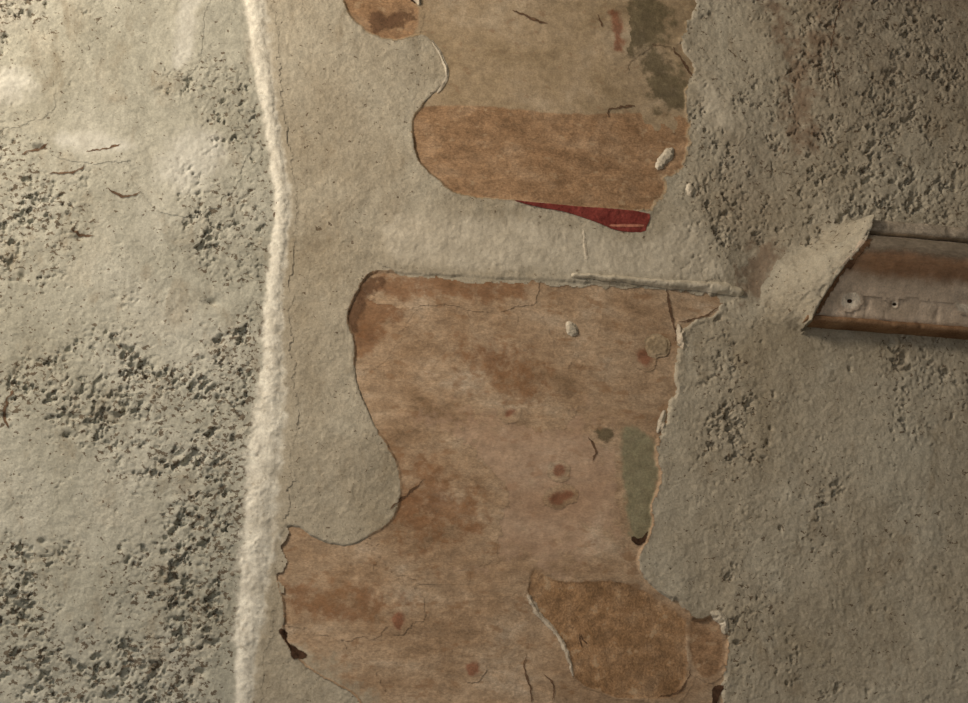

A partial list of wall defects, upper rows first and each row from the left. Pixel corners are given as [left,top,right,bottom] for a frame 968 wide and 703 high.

flaking render [343,0,697,212]
damp [607,0,748,146]
damp [736,0,882,175]
crack [666,290,718,341]
flaking render [276,269,732,703]